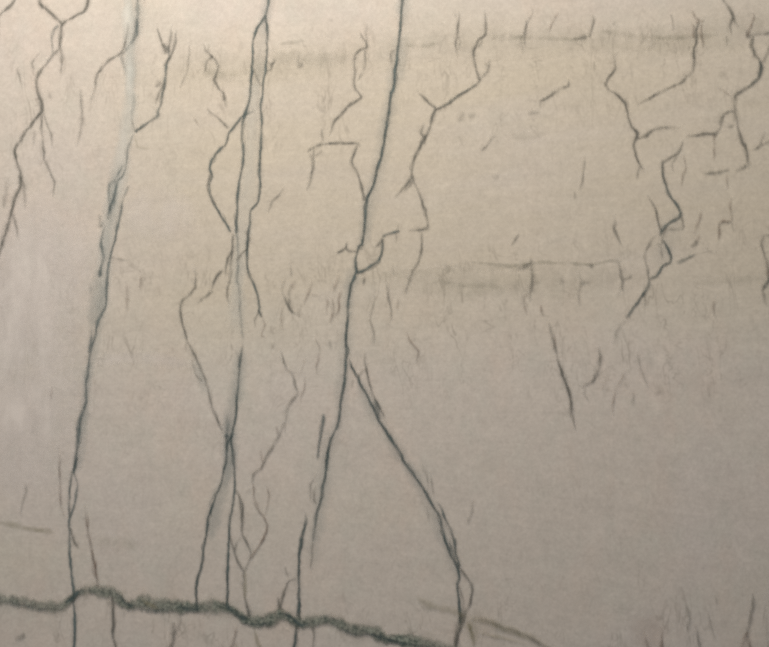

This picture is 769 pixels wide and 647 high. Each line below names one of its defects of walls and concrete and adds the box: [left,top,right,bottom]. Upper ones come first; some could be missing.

crack [123,2,133,27]
crack [11,94,42,211]
crack [90,125,143,345]
crack [209,0,269,313]
crack [322,0,462,644]
crack [629,154,681,314]
crack [60,396,435,647]